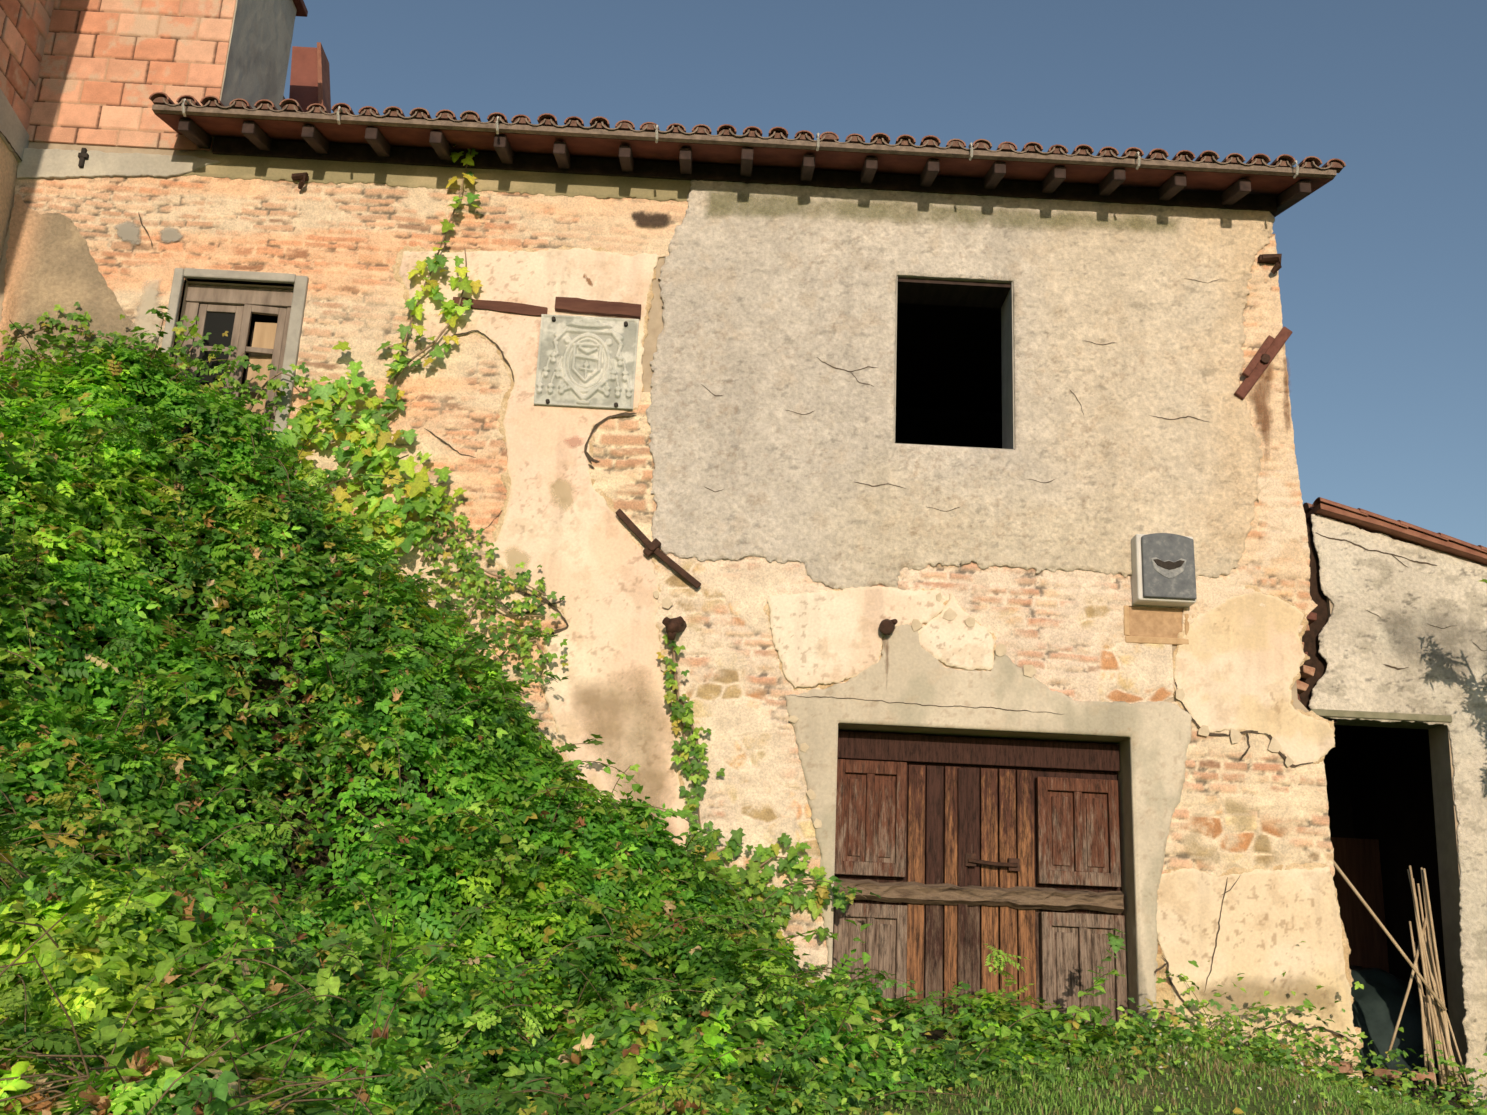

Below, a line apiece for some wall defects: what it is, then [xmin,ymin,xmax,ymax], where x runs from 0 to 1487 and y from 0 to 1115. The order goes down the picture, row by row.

flaking render [14,175,688,780]
flaking render [872,234,1318,706]
flaking render [589,392,847,987]
crack [1175,682,1313,767]
flaking render [1162,722,1335,877]
crack [1296,524,1437,724]
crack [1154,876,1240,1019]